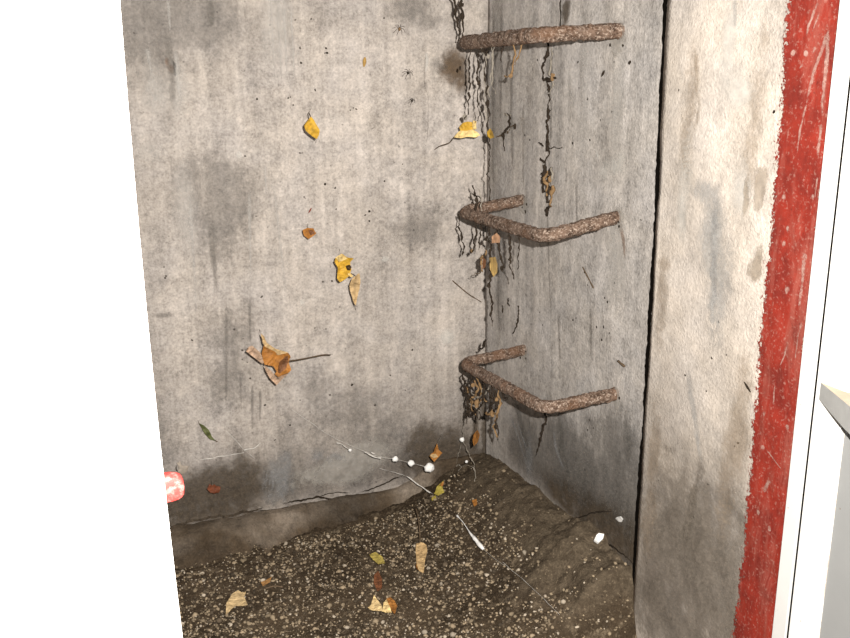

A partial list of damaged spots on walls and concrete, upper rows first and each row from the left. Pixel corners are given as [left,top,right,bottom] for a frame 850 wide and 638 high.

corrosion [442,52,466,90]
crack [608,0,668,585]
damp [407,401,485,474]
damp [167,456,266,526]
crack [224,476,402,518]